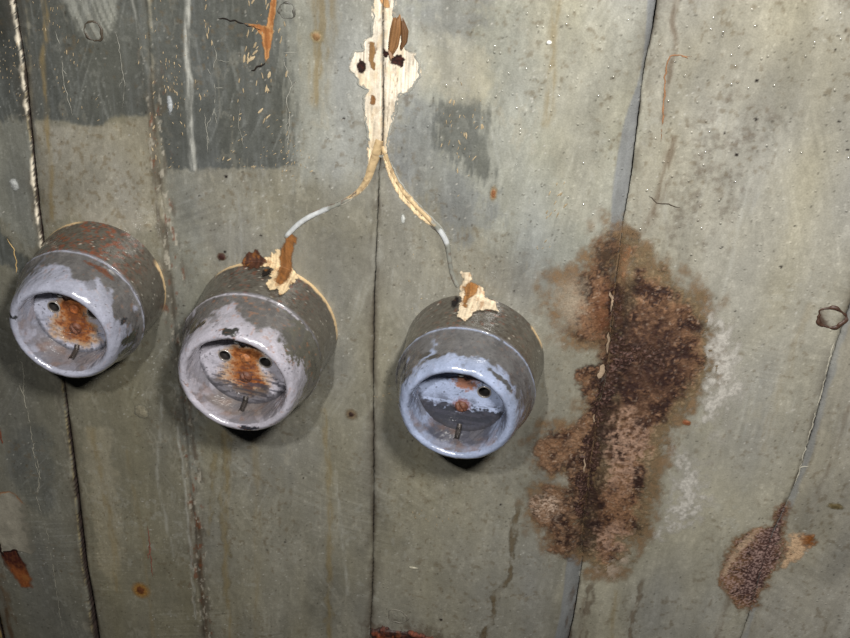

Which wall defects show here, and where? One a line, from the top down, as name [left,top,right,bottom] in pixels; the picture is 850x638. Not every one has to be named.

peeling [349,0,421,158]
peeling [0,491,34,587]